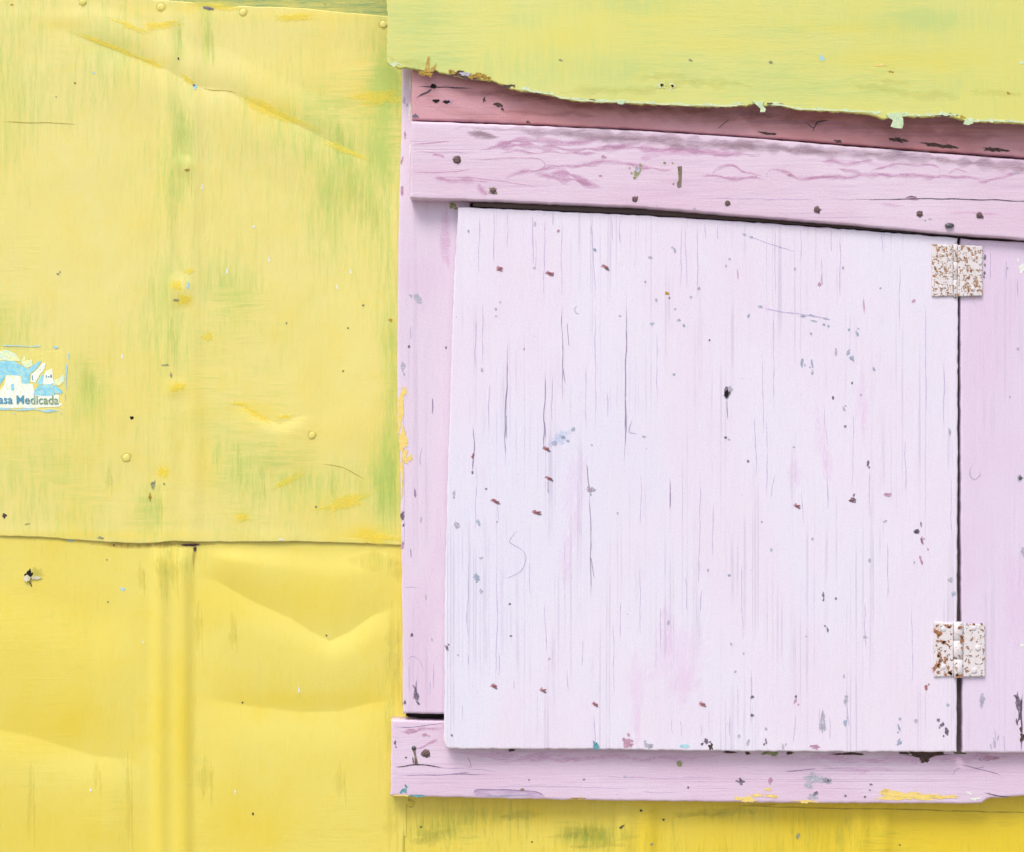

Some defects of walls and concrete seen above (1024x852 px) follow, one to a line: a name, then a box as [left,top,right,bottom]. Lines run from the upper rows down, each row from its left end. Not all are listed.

peeling [390,57,436,120]
peeling [448,70,491,81]
peeling [502,84,1024,149]
rust [932,244,980,298]
rust [932,623,985,678]